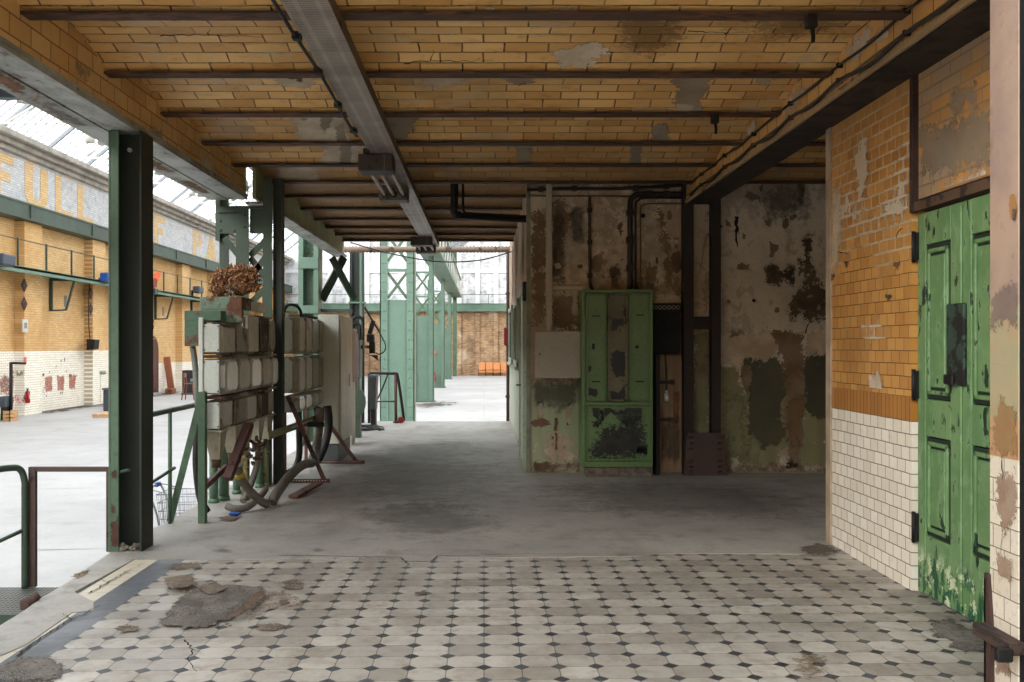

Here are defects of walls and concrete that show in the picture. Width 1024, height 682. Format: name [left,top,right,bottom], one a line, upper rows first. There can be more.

peeling [551,41,611,70]
peeling [668,78,714,112]
peeling [531,184,670,331]
peeling [721,213,835,473]
peeling [989,395,1017,459]